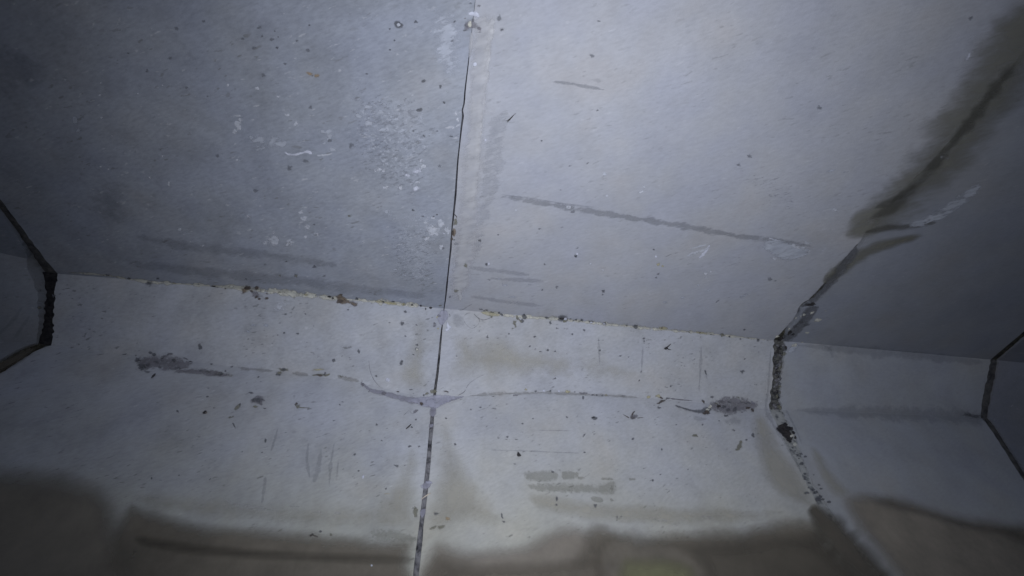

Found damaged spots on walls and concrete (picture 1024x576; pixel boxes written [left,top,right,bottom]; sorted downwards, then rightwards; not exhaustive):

spalling [776,422,797,446]